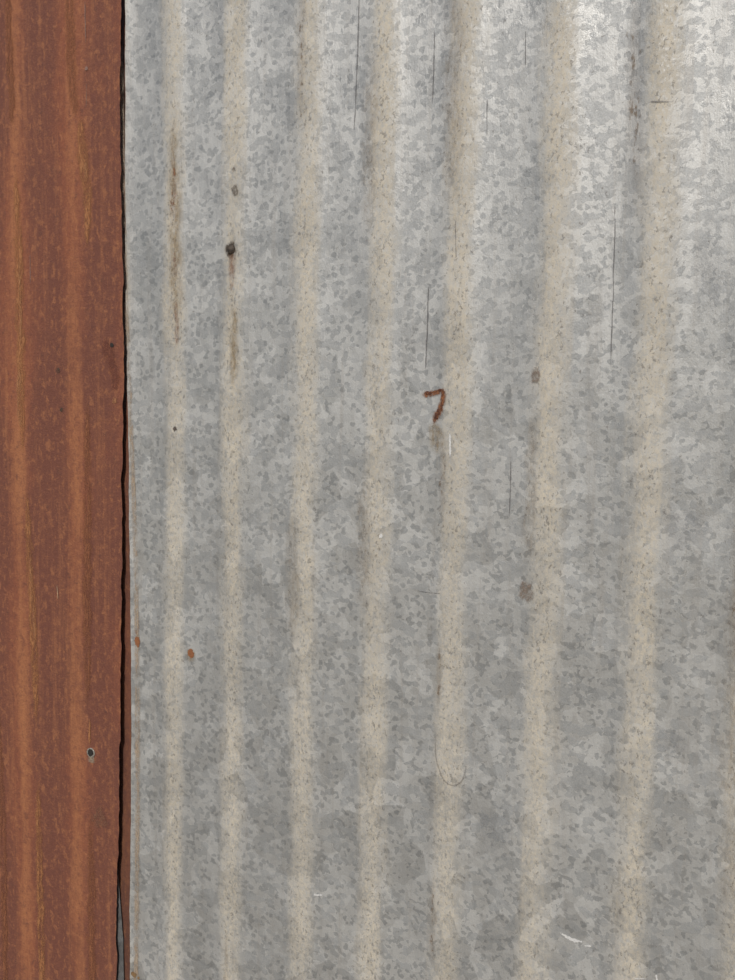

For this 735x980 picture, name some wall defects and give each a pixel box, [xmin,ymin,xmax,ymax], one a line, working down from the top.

rust [424,389,445,450]